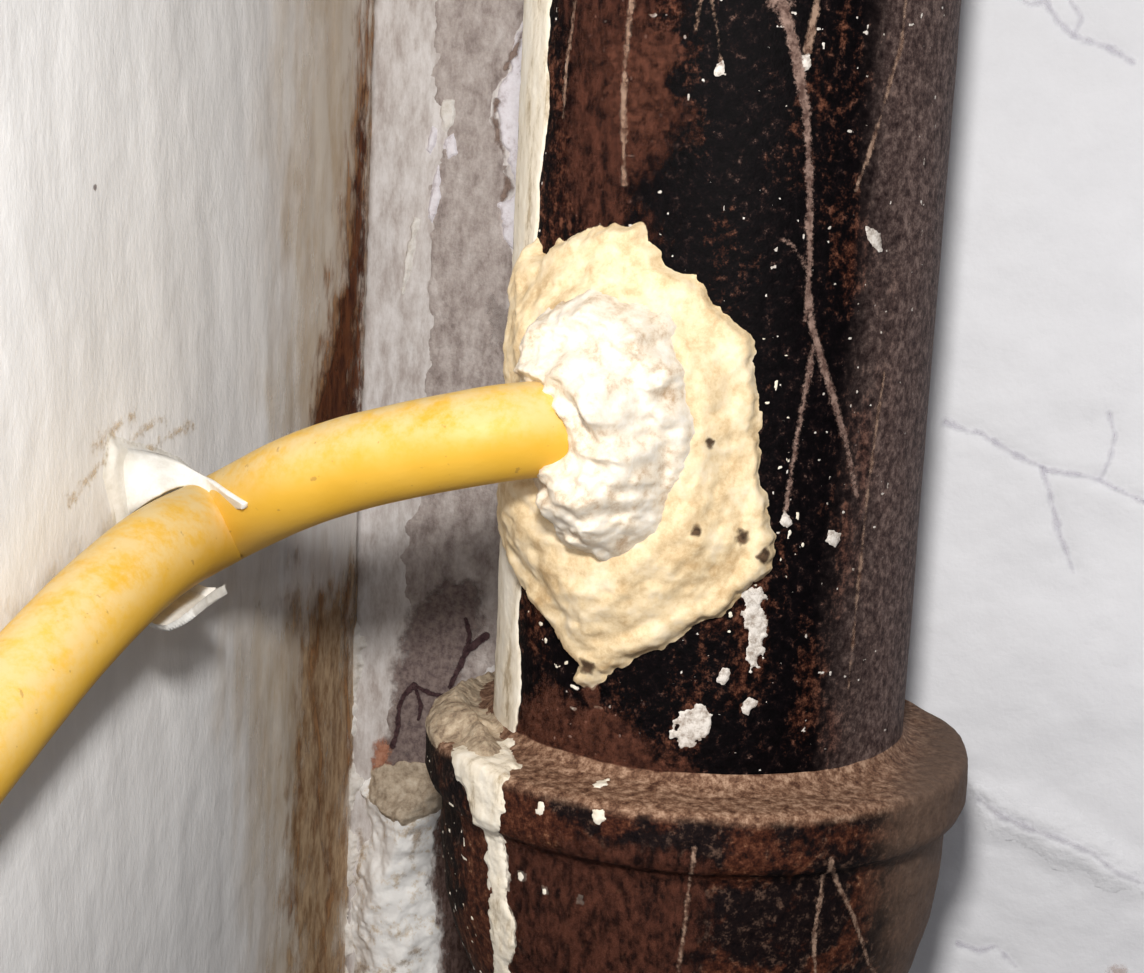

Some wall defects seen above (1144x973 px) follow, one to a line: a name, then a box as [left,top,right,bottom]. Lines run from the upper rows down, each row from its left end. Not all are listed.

corrosion [559,0,696,238]
leakage [288,0,359,429]
peeling [401,0,524,397]
peeling [400,483,501,686]
leakage [253,618,326,973]
peeling [347,752,364,889]
peeling [351,621,367,737]
spalling [371,697,400,769]
corrosion [515,675,692,773]
peeling [343,903,354,973]
corrosion [506,831,713,973]